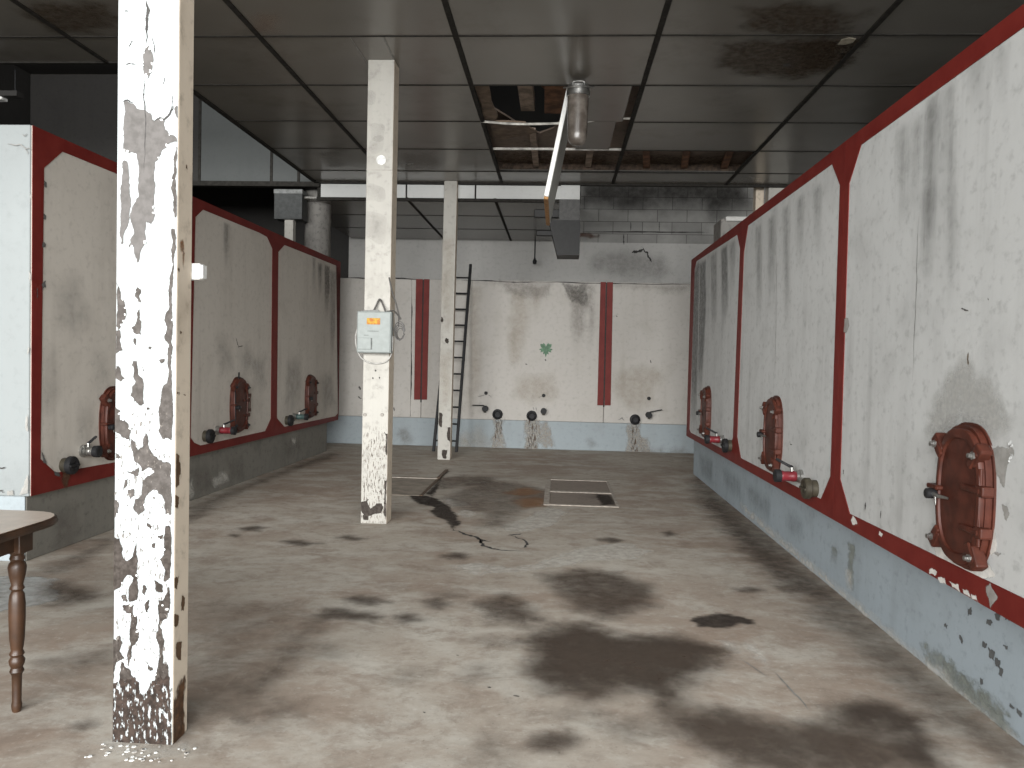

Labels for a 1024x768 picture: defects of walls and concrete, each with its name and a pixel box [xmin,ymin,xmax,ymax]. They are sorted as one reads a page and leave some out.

peeling [141,43,153,78]
peeling [84,101,196,762]
peeling [361,432,388,523]
peeling [992,440,1014,487]
crack [453,529,529,551]
leakage [450,538,648,615]
flaking render [929,531,1006,626]
leakage [527,625,717,698]